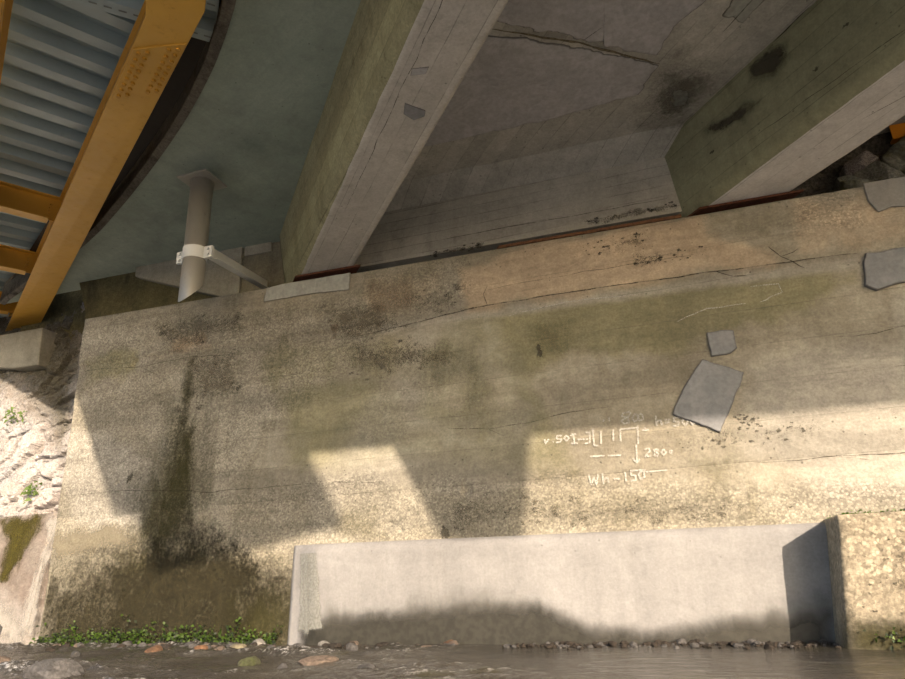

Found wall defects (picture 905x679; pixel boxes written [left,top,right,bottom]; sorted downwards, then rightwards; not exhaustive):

crack [493,28,659,64]
spalling [587,201,677,224]
leakage [0,419,829,646]